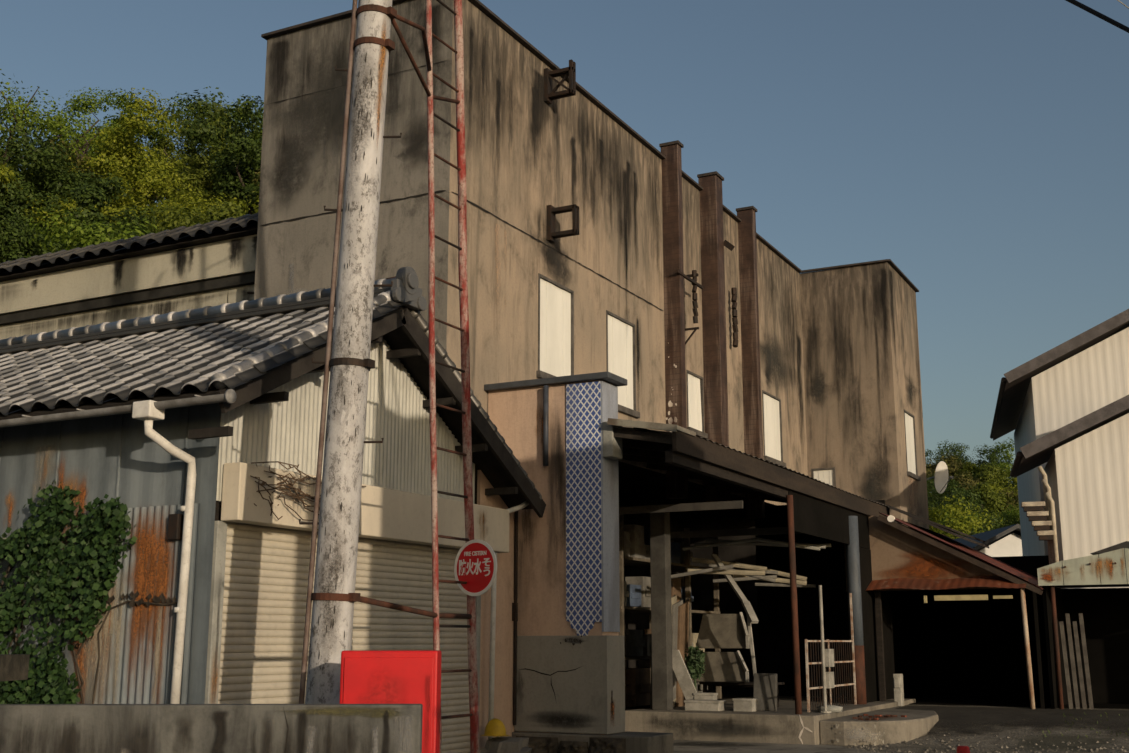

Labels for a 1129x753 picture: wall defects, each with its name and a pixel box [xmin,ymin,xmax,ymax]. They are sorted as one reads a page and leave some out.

leakage [423,5,440,50]
leakage [275,49,353,195]
rust [378,32,386,123]
leakage [532,71,558,137]
leakage [571,125,637,280]
leakage [863,269,894,375]
leakage [760,306,825,434]
rust [56,466,86,532]
rust [131,521,170,664]
rust [1096,559,1124,576]
crack [519,666,582,699]
leakage [212,712,226,753]